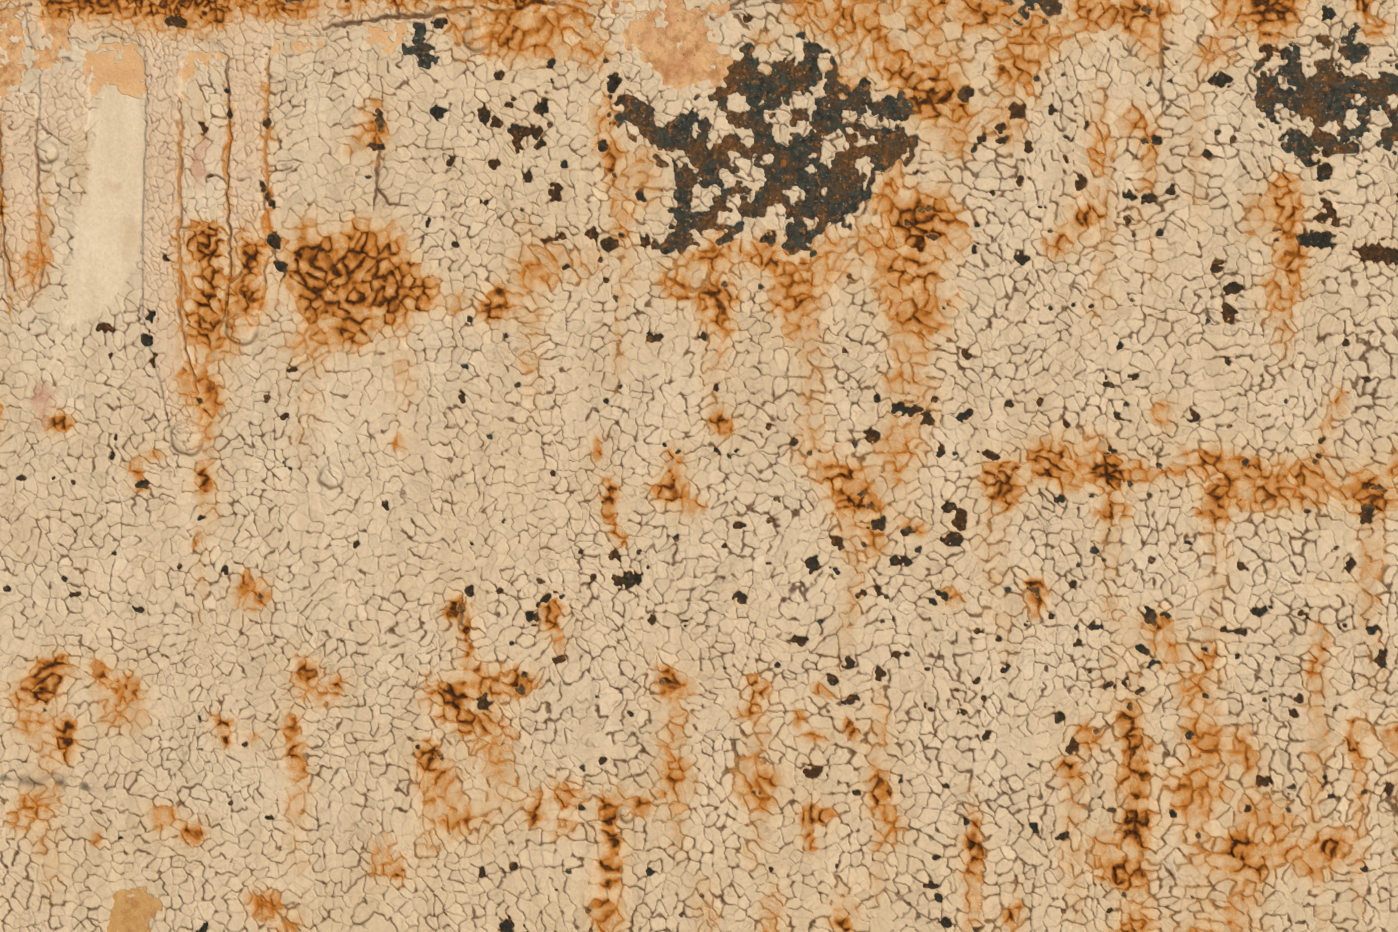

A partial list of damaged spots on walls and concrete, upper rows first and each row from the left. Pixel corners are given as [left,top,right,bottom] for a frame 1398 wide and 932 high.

crack [176,53,242,335]
rust [170,83,589,505]
peeling [472,98,549,154]
peeling [584,226,619,253]
crack [683,0,824,61]
peeling [597,0,918,258]
rust [659,160,968,403]
peeling [1253,6,1398,266]
crack [1269,0,1398,80]
rust [978,388,1398,527]
crack [856,718,888,766]
rust [1056,614,1365,932]